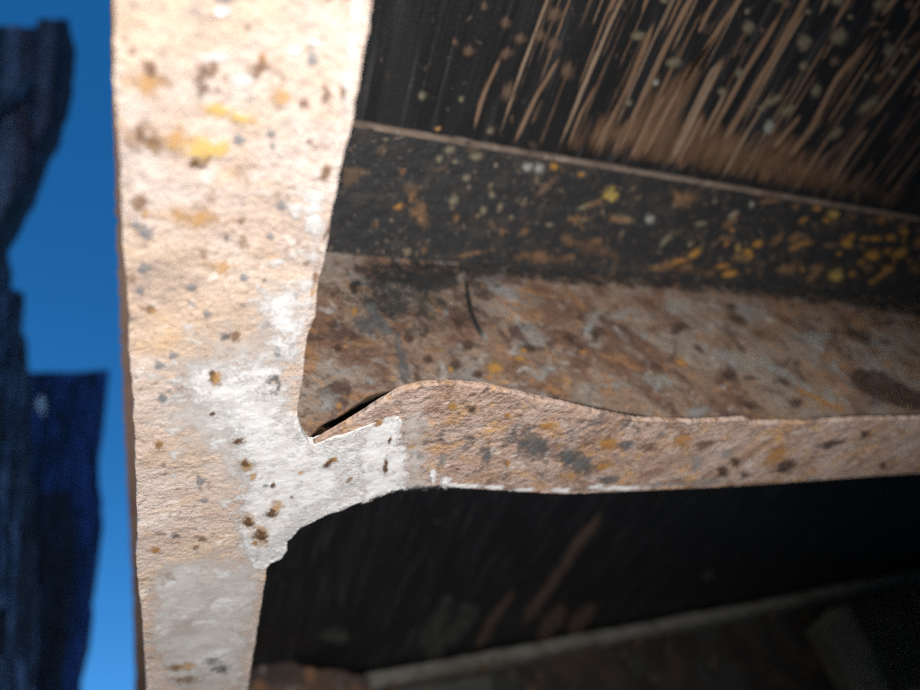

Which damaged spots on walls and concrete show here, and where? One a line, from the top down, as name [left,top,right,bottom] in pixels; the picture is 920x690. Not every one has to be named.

corrosion [514,235,606,265]
crack [311,390,392,437]
crack [557,399,651,417]
corrosion [848,368,920,411]